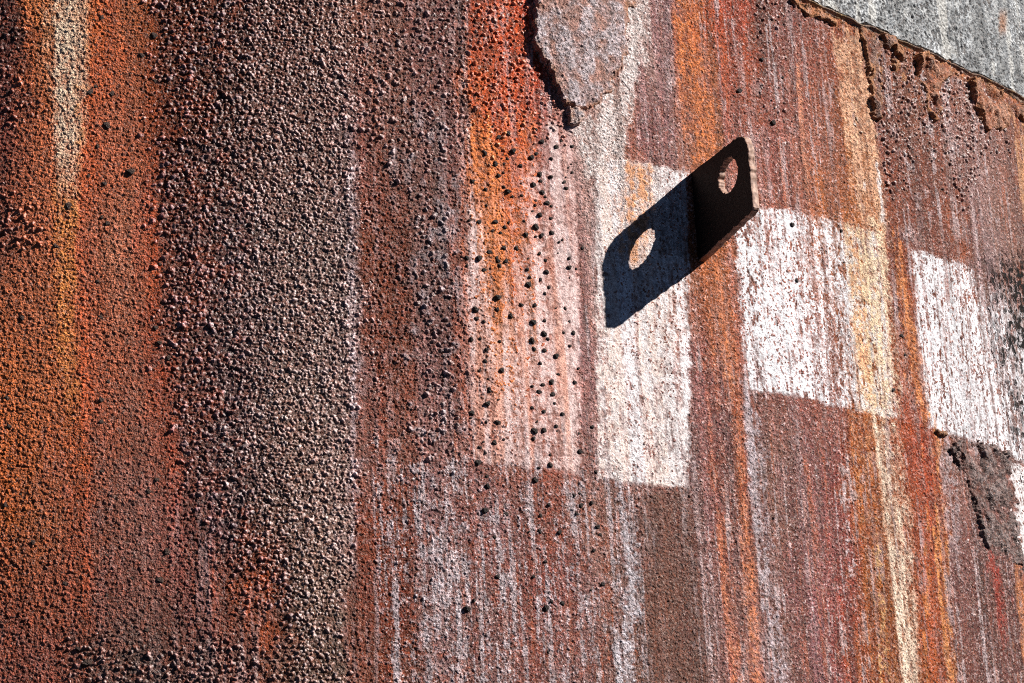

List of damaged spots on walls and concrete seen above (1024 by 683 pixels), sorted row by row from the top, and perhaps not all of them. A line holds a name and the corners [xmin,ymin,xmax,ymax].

peeling [789,0,846,28]
peeling [859,26,954,123]
peeling [966,76,1024,132]
corrosion [0,0,584,683]
corrosion [751,0,1024,683]